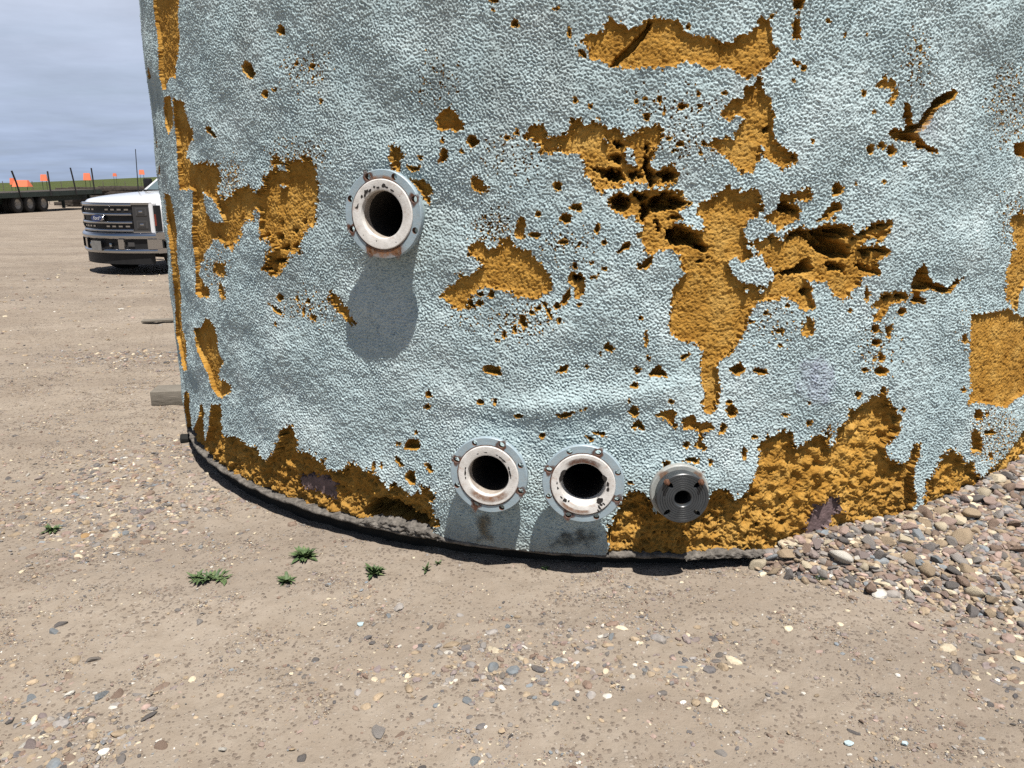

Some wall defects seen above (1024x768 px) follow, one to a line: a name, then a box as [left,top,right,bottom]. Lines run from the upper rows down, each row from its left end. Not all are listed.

peeling [147,0,441,532]
peeling [411,11,1024,554]